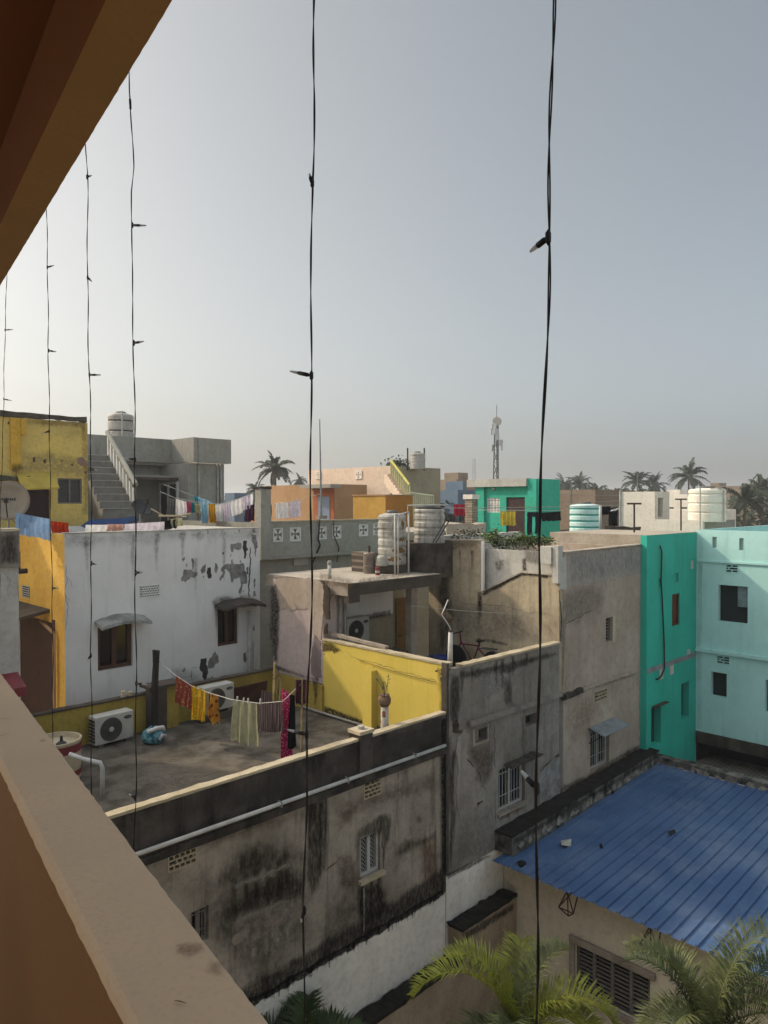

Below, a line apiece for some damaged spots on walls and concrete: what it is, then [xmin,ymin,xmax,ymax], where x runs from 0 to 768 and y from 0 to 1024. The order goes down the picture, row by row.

peeling [181,529,258,596]
peeling [199,652,219,680]
water stain [223,802,327,962]
water stain [243,655,548,1006]